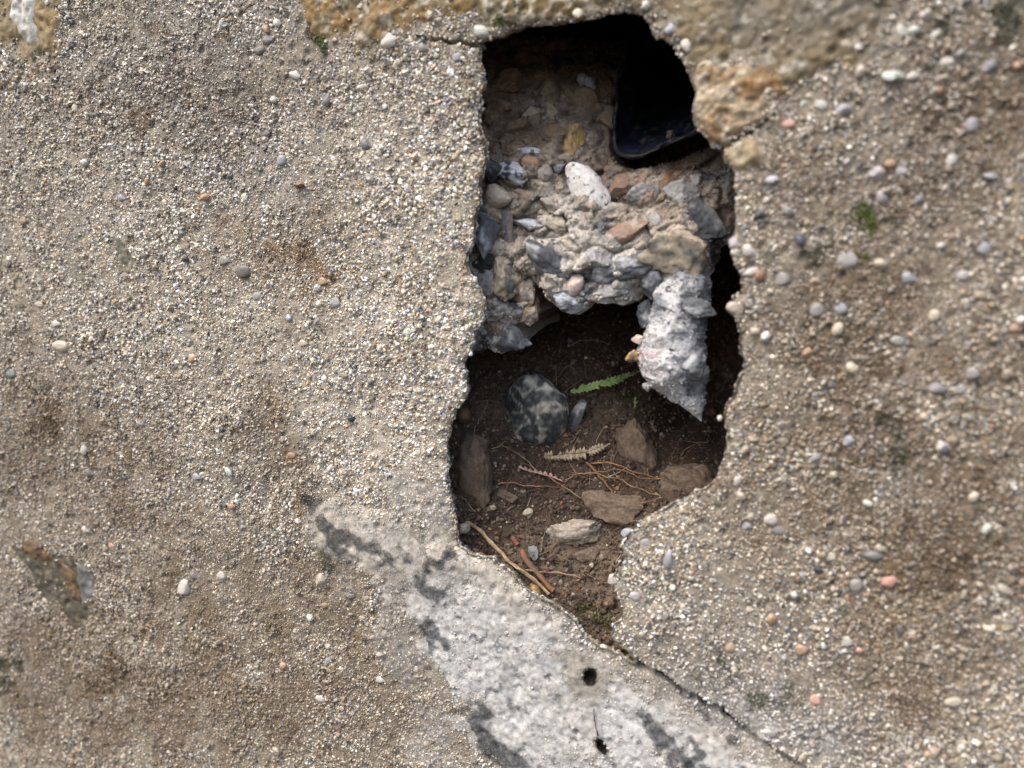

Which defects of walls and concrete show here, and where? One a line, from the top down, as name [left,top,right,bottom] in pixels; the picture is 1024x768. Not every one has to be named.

spalling [444,8,779,664]